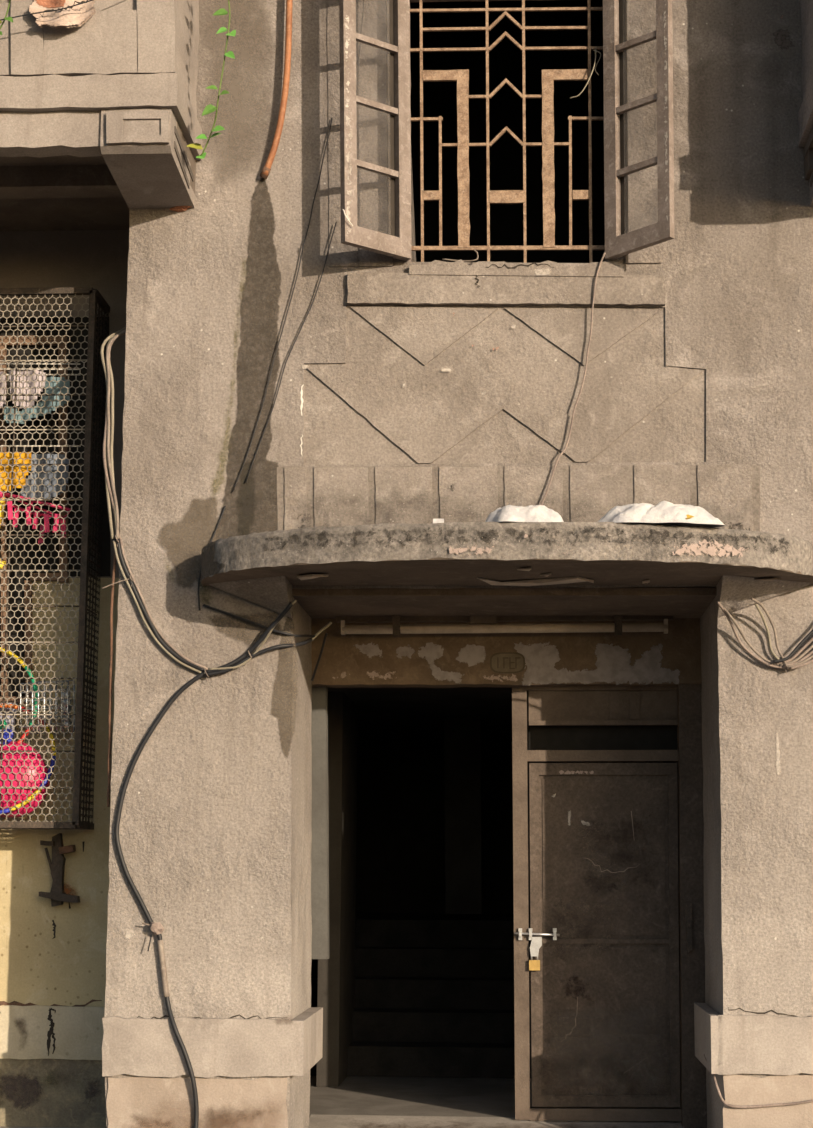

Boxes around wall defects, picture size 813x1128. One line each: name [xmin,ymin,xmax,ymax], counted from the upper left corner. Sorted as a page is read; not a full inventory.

spalling [29,0,95,29]
damp [159,178,789,603]
damp [212,613,298,757]
peeling [355,642,680,686]